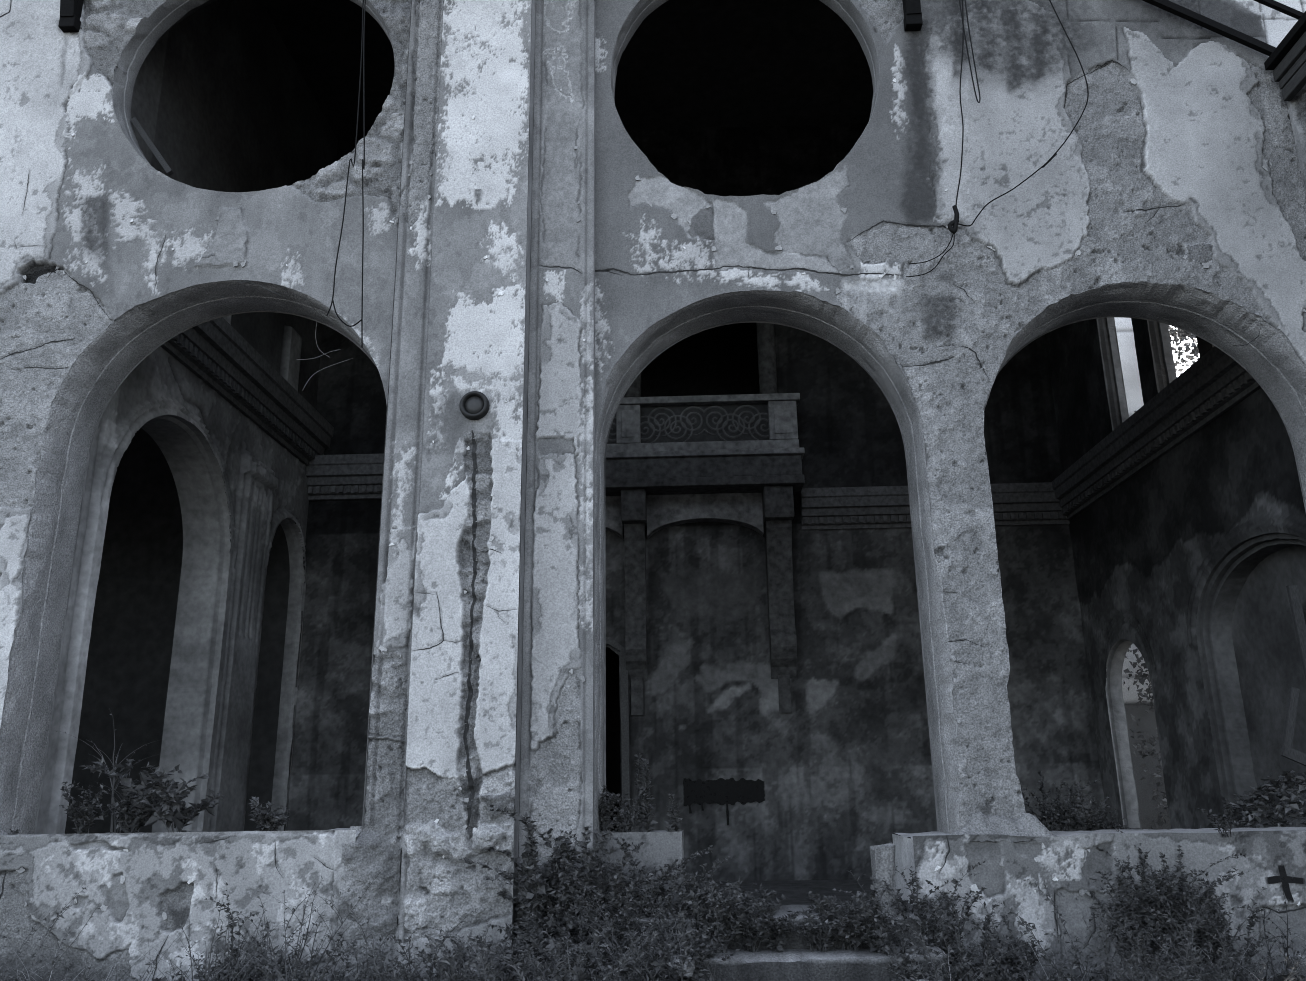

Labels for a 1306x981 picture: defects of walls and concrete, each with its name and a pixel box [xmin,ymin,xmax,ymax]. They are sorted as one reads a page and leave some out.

spalling [0,0,216,509]
peeling [281,249,304,289]
peeling [292,0,607,556]
crack [545,265,897,276]
crack [847,220,960,242]
spalling [1227,48,1306,259]
peeling [577,280,615,631]
spalling [623,56,1269,974]
crack [413,430,517,830]
spalling [0,867,131,981]
spalling [71,840,130,852]
spalling [159,878,194,932]